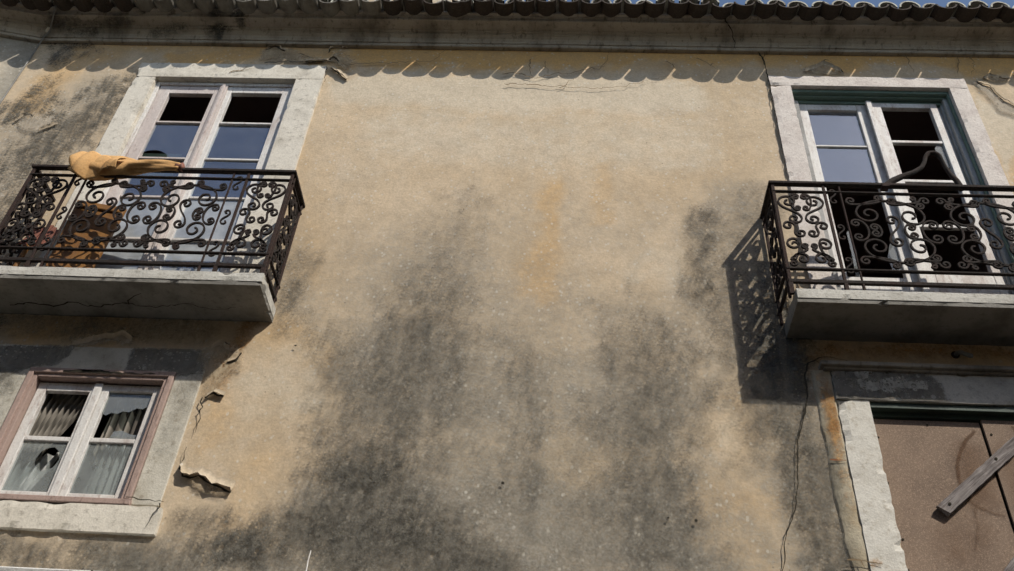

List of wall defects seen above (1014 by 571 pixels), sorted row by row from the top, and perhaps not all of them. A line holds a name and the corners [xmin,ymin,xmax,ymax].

flaking render [261,44,352,82]
crack [504,56,675,89]
crack [725,18,787,170]
flaking render [976,73,1014,114]
water stain [0,15,136,231]
crack [15,293,231,310]
flaking render [195,339,243,432]
peeling [853,371,928,393]
water stain [0,305,519,571]
flaking render [179,447,236,494]
crack [782,357,847,571]